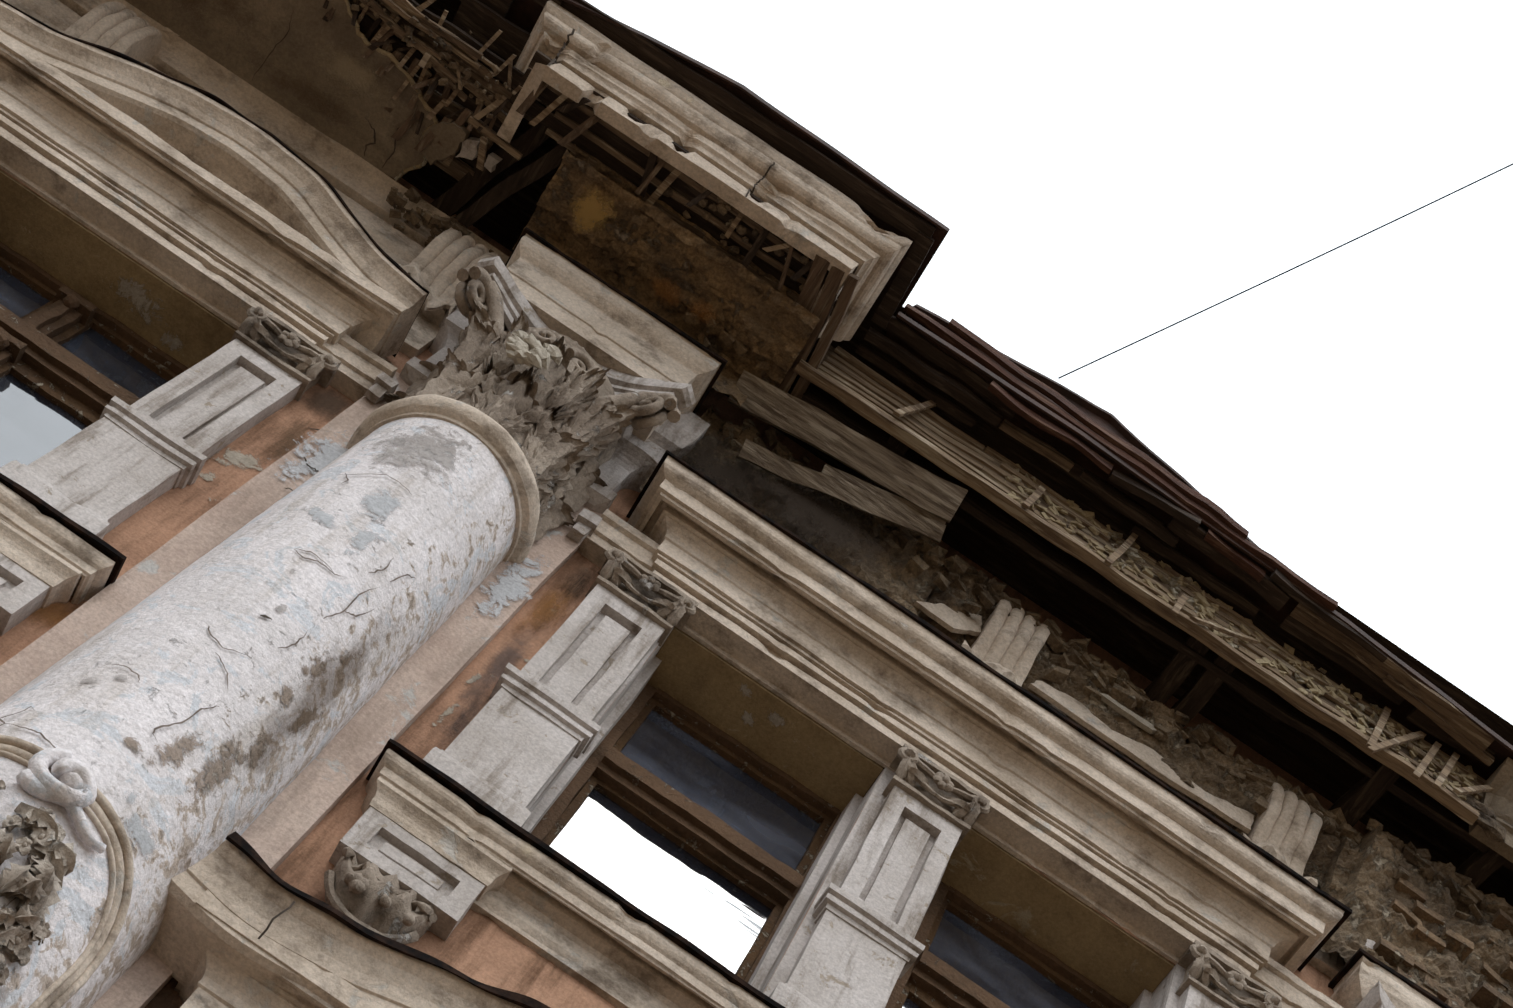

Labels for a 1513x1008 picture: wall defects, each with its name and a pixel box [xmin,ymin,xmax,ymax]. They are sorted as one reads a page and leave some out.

peeling [198,425,480,501]
crack [285,428,412,495]
peeling [308,506,339,528]
flaking render [322,0,1513,1008]
crack [152,548,415,742]
crack [0,706,56,748]
peeling [124,650,357,810]